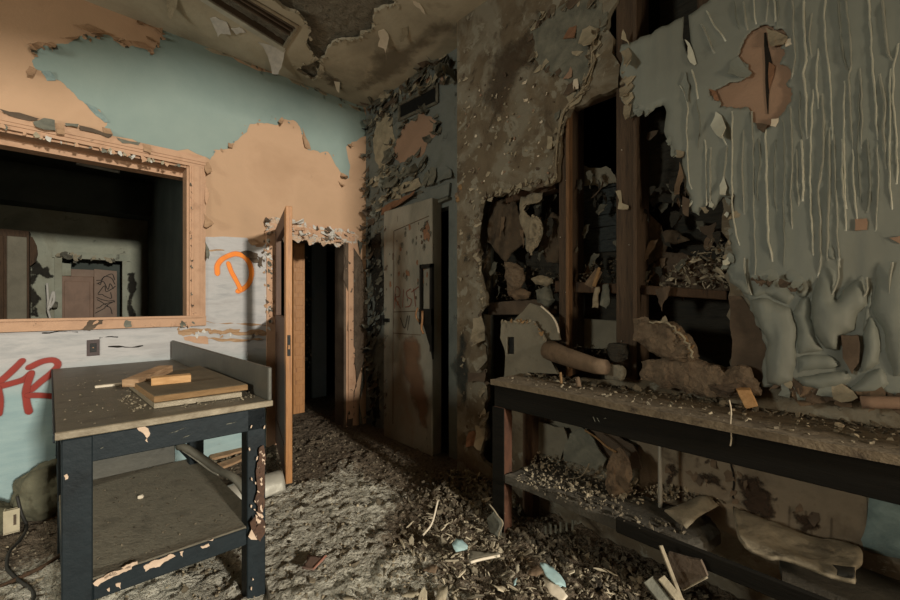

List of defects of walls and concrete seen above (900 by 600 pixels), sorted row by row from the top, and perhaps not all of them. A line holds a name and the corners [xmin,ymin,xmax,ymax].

spalling [332,0,400,53]
peeling [527,0,608,178]
crack [764,32,775,113]
peeling [0,11,490,451]
peeling [619,0,900,407]
spalling [93,551,183,592]